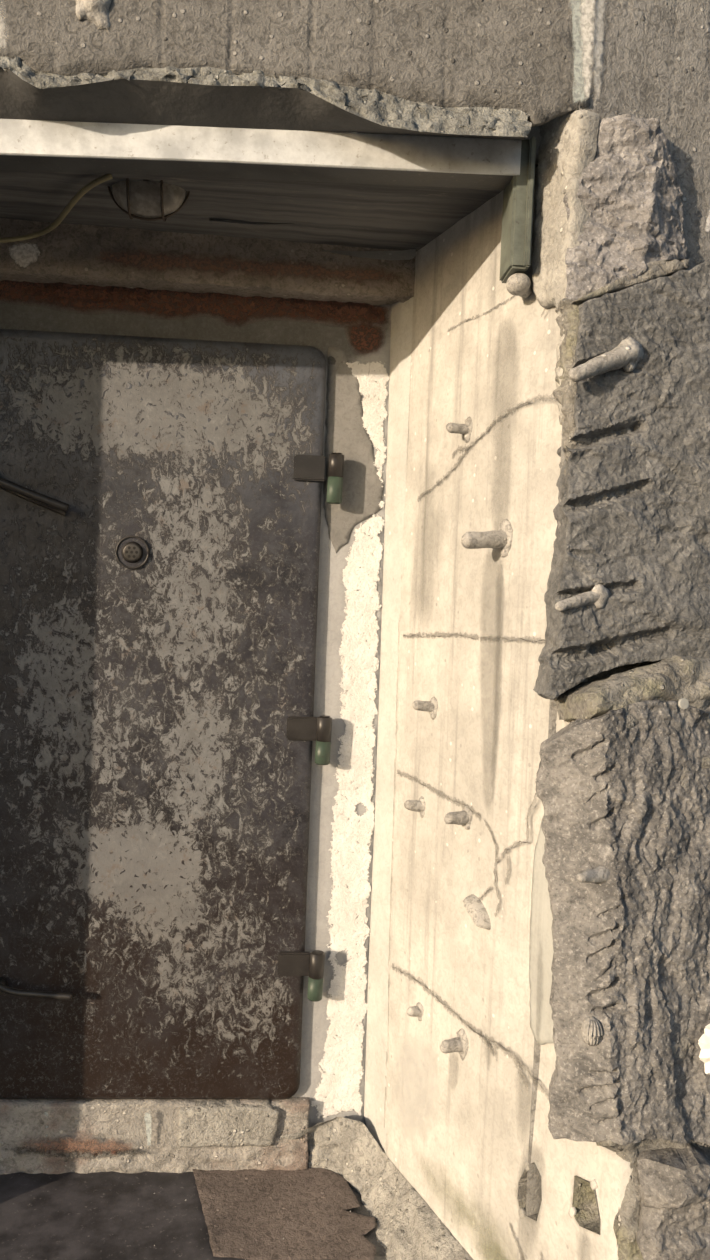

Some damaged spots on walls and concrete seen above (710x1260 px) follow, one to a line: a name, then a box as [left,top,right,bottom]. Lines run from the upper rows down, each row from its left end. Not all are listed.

spalling [0,56,532,137]
crack [418,397,554,499]
crack [402,634,545,642]
peeling [311,361,390,1120]
crack [396,773,536,914]
crack [393,967,546,1093]
spalling [517,1160,542,1221]
spalling [569,1176,601,1235]